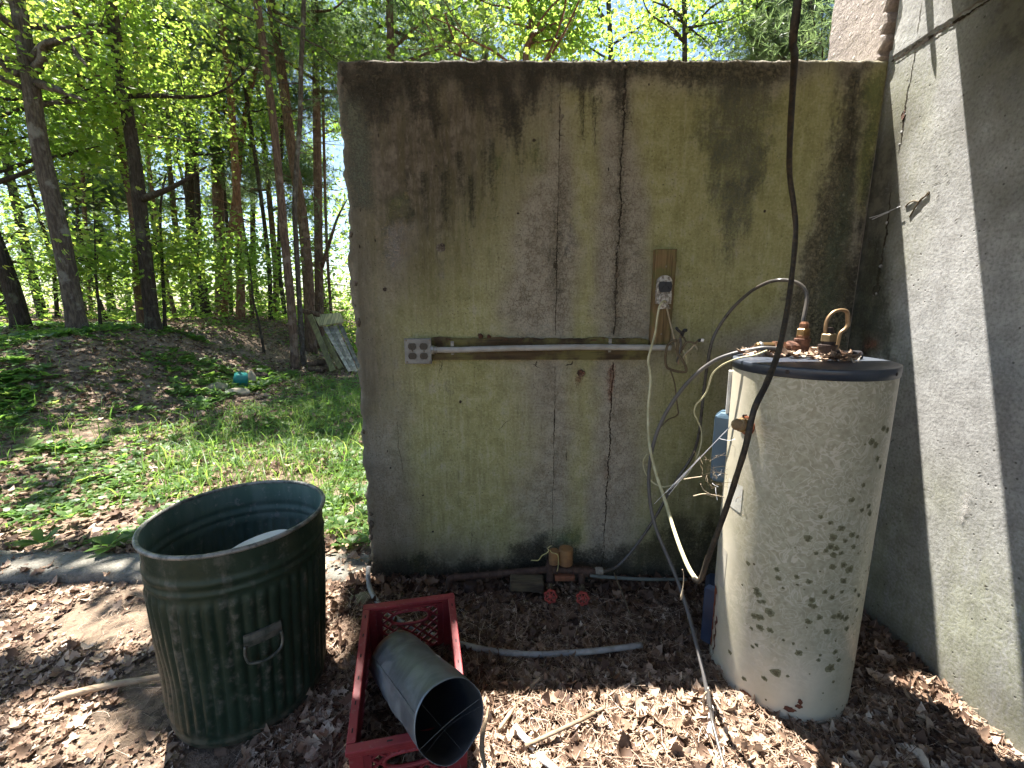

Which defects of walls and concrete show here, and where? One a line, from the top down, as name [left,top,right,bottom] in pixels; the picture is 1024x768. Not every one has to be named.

water stain [337,60,791,229]
crack [551,61,632,335]
water stain [370,518,718,583]
crack [601,363,615,561]